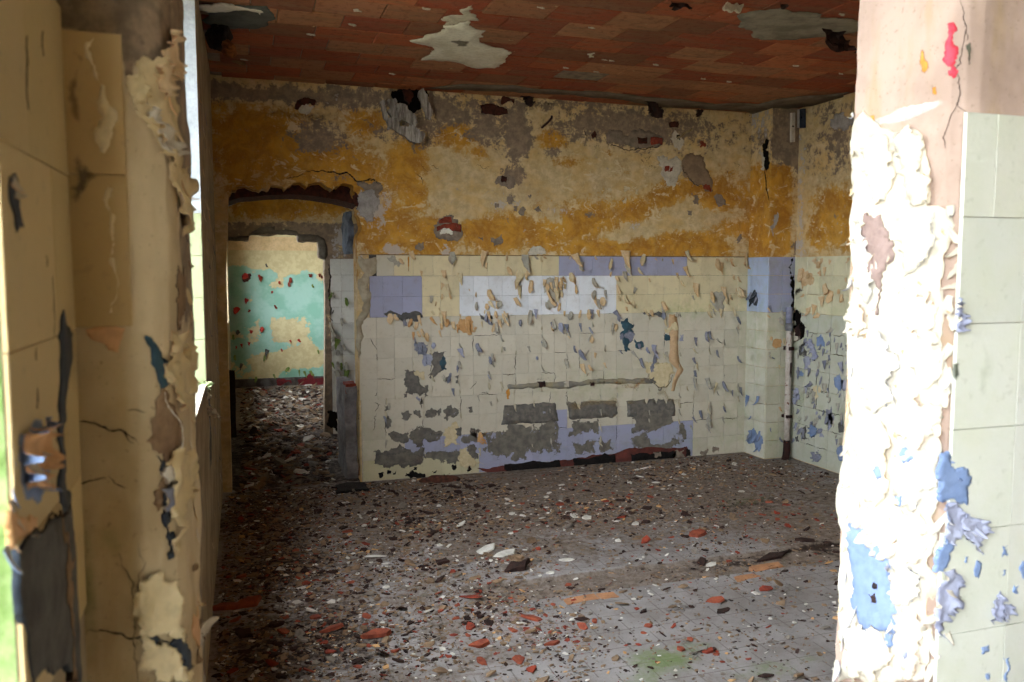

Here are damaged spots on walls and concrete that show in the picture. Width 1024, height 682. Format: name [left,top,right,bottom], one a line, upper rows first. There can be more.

peeling [737,8,858,40]
crack [943,0,968,141]
peeling [379,84,850,144]
crack [287,170,377,183]
peeling [273,318,350,386]
crack [80,409,146,443]
peeling [373,110,994,682]
peeling [132,261,222,682]
peeling [3,417,81,682]
peeling [990,561,1024,625]